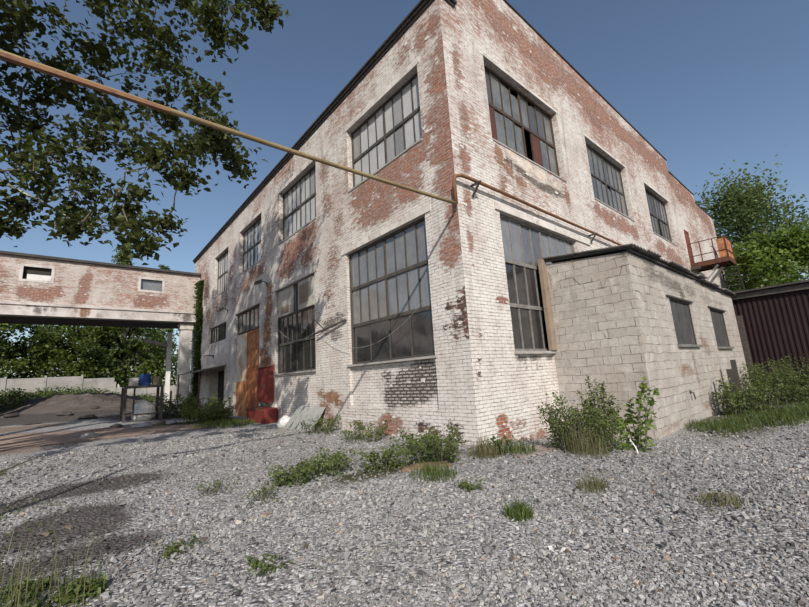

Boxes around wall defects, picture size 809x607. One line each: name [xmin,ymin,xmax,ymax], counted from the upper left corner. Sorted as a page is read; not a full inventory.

peeling [346,16,474,266]
peeling [474,0,713,241]
peeling [278,220,318,278]
peeling [318,156,344,302]
peeling [0,266,64,302]
peeling [73,272,94,304]
peeling [133,294,167,307]
spalling [440,286,469,340]
spalling [371,359,468,445]
peeling [496,414,546,443]